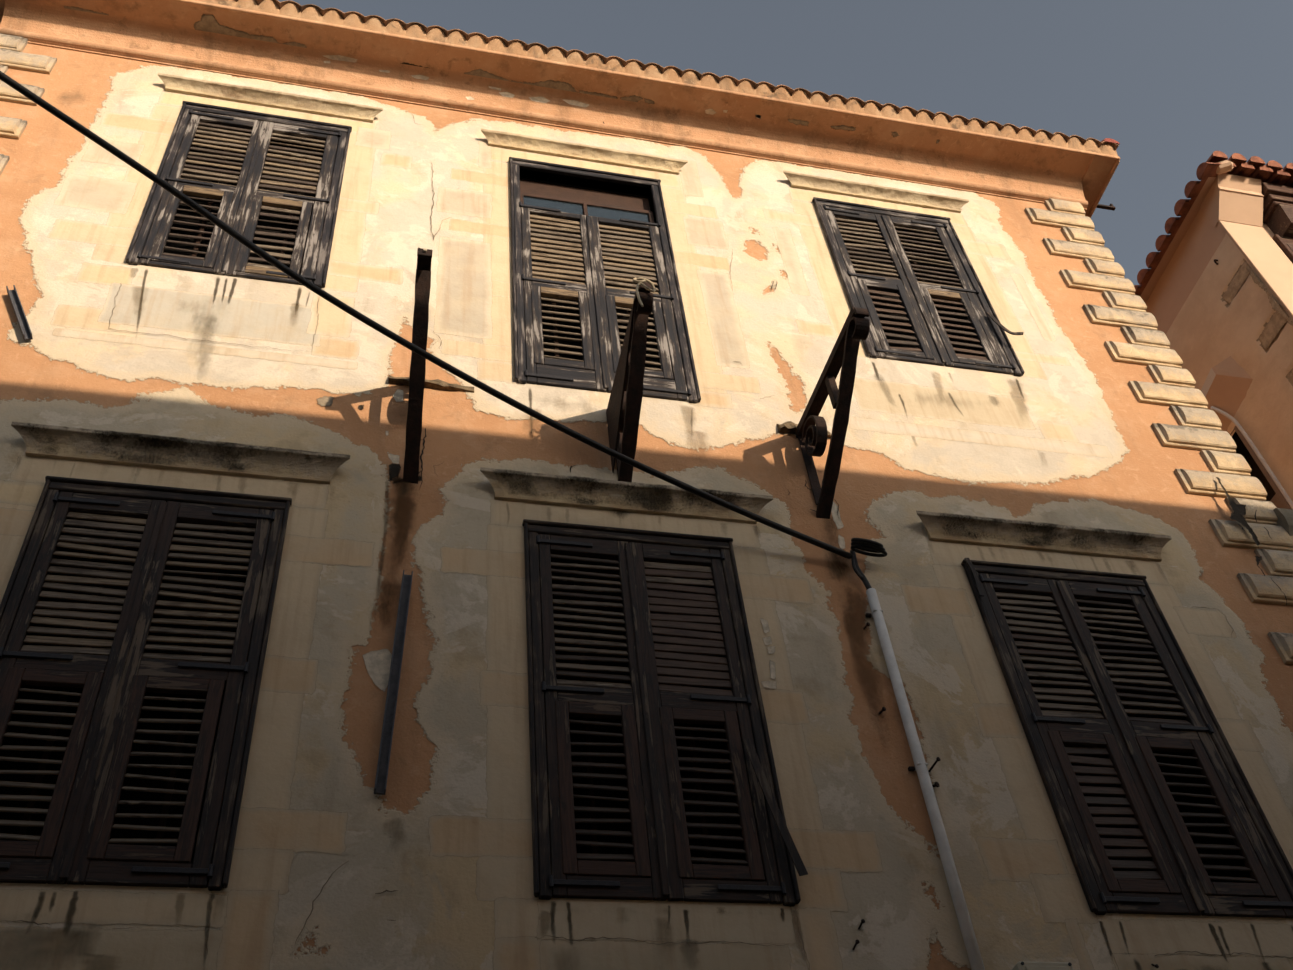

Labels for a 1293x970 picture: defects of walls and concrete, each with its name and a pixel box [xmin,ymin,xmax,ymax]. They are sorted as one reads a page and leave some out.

leakage [214,278,237,301]
peeling [88,65,1131,487]
rust [395,484,413,545]
peeling [0,136,618,970]
peeling [632,465,972,970]
peeling [863,490,1293,970]
leakage [34,892,55,918]
leakage [65,892,78,931]
leakage [551,903,572,939]
leakage [1100,921,1127,953]
leakage [1209,924,1229,957]